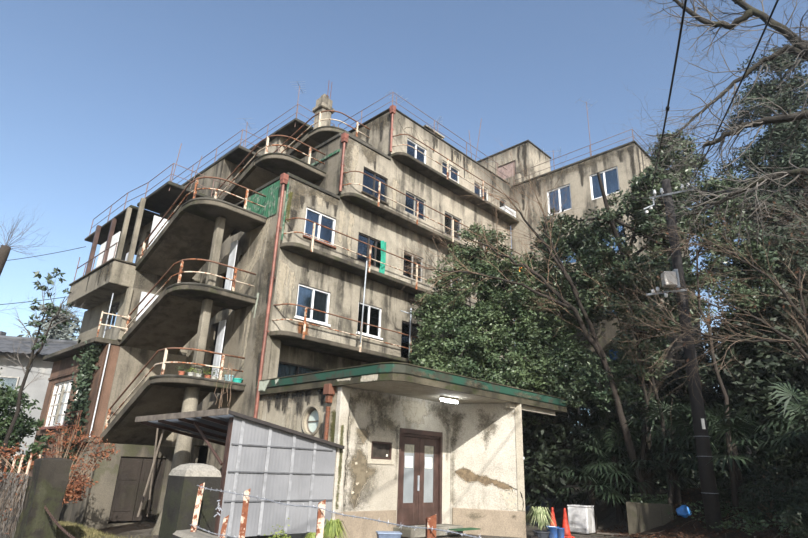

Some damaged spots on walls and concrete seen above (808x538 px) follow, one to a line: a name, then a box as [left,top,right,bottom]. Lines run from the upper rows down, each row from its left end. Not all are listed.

water stain [451,149,474,178]
water stain [513,144,608,210]
water stain [617,145,644,176]
water stain [259,389,324,430]
water stain [357,426,369,444]
water stain [431,403,463,437]
water stain [479,410,497,440]
peeling [454,467,518,510]